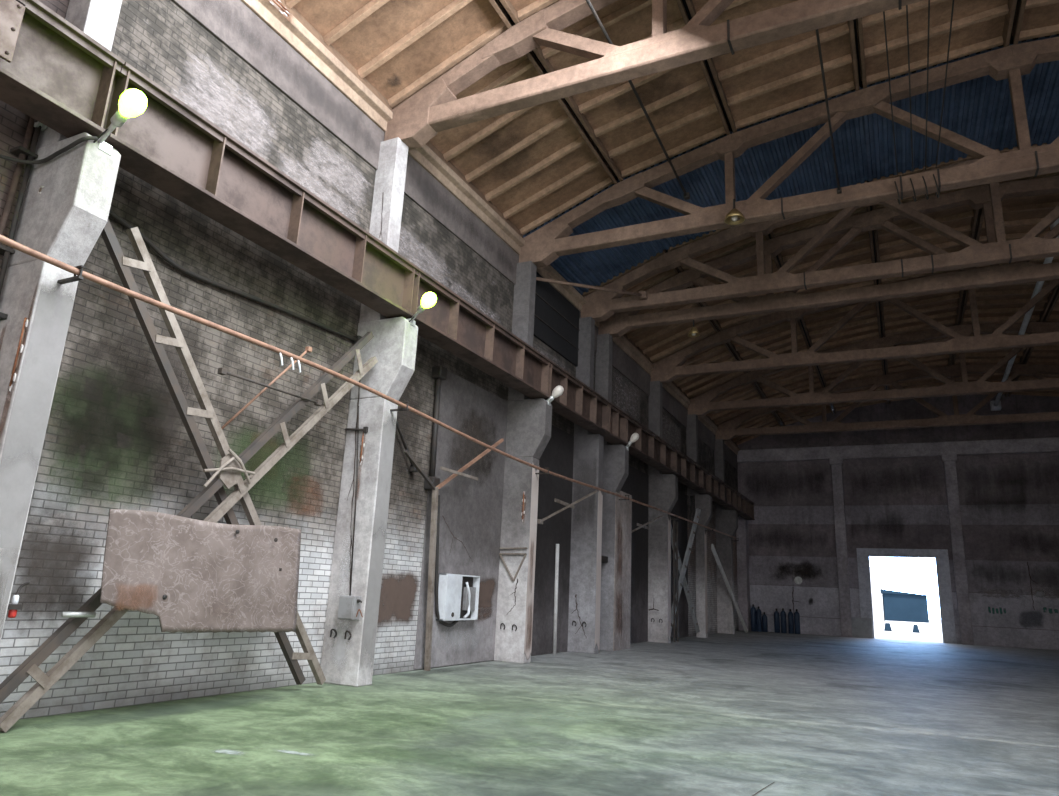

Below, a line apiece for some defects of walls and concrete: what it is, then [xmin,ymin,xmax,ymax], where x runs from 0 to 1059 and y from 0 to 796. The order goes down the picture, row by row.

leakage [0,288,74,638]